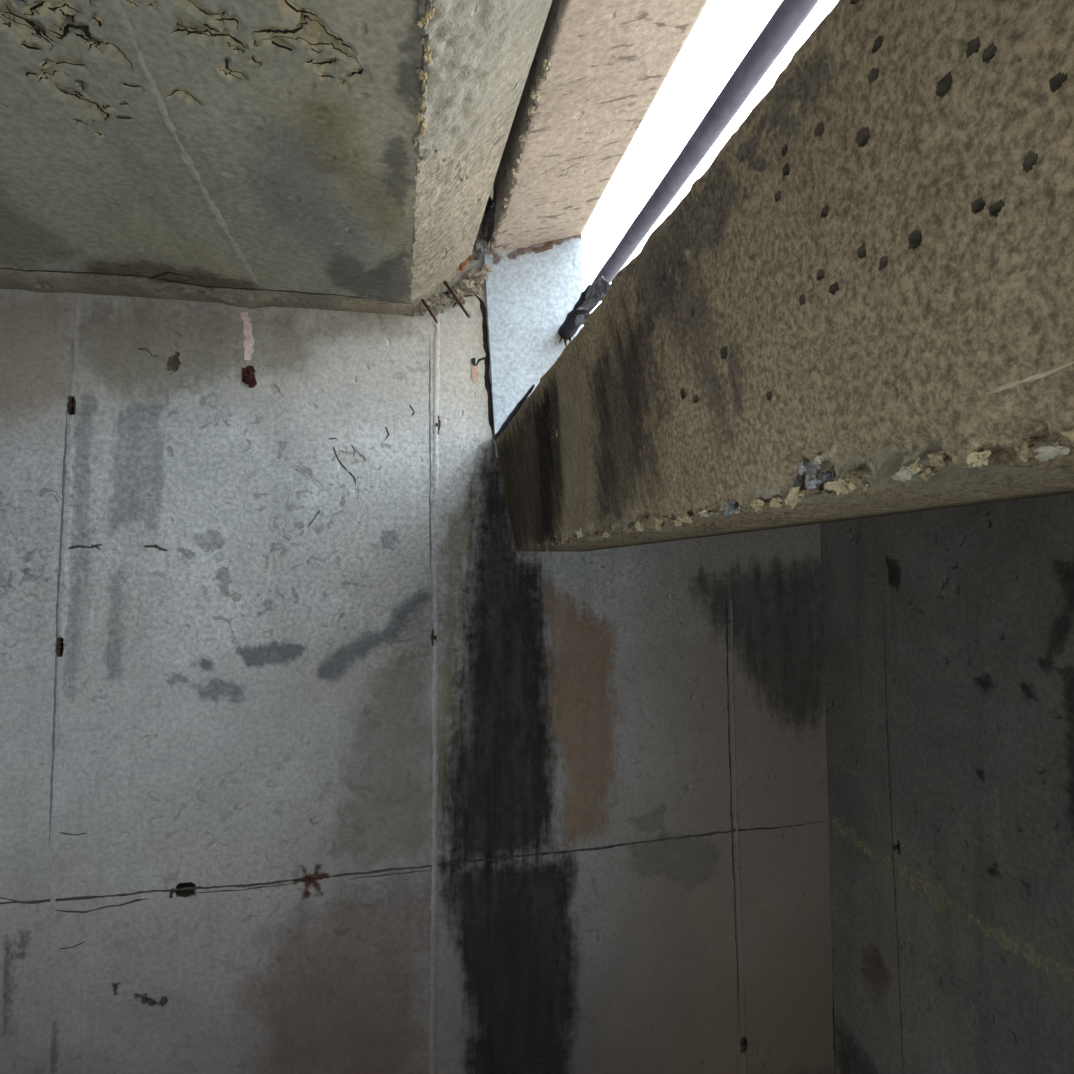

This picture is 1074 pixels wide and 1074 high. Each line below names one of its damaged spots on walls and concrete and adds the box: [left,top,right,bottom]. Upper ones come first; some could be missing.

spalling [0,0,206,140]
spalling [145,0,376,99]
spalling [408,0,435,298]
rust [242,365,257,388]
spalling [532,435,870,549]
spalling [892,451,948,482]
spalling [1014,392,1074,463]
damp [238,642,303,667]
damp [318,594,429,678]
damp [442,373,584,1074]
rust [294,865,328,898]
crack [0,821,827,913]